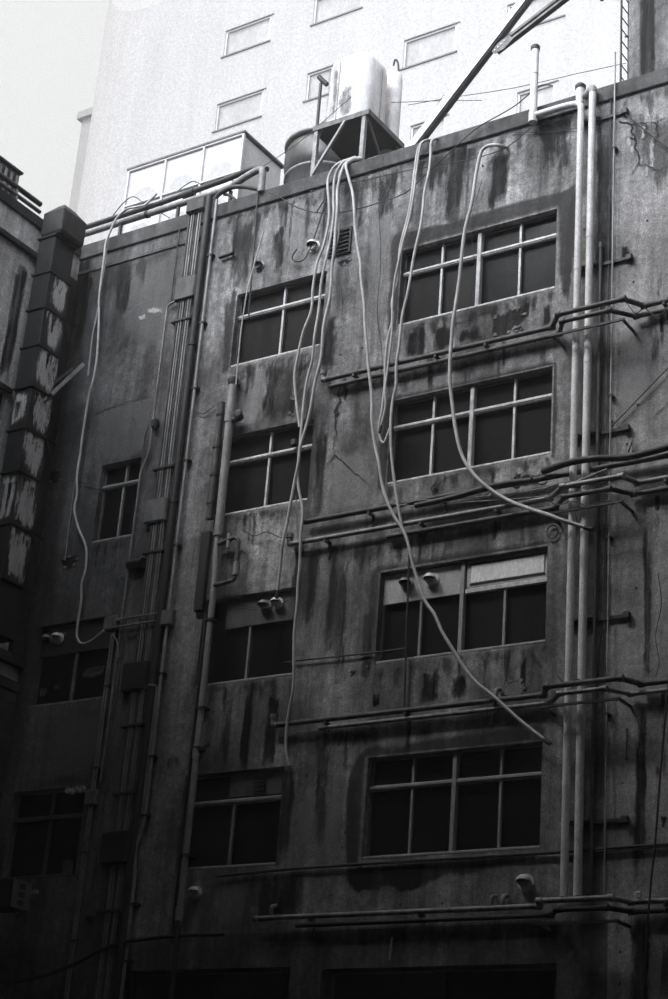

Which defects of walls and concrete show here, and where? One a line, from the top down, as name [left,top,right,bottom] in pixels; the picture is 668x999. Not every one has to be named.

leakage [446,144,470,222]
leakage [489,148,509,206]
crack [619,118,666,173]
leakage [0,265,27,375]
leakage [322,322,335,367]
leakage [407,321,482,356]
leakage [245,365,313,423]
crack [327,387,365,481]
leakage [643,531,651,669]
leakage [452,675,465,697]
leakage [240,689,253,766]
leakage [633,712,646,867]